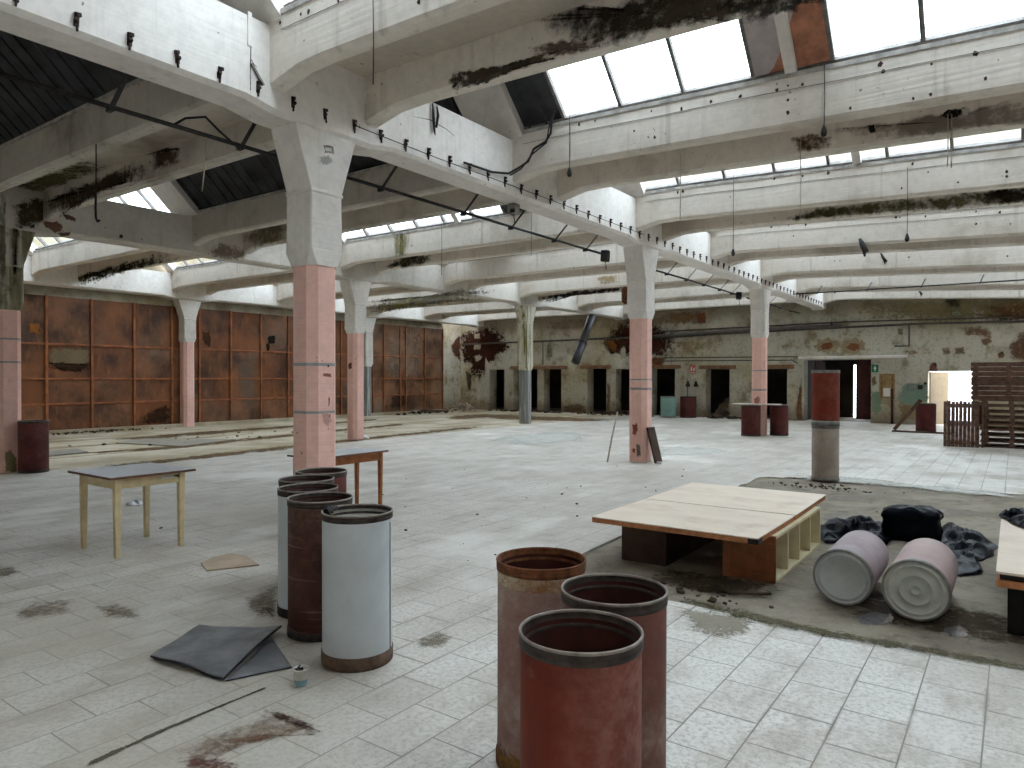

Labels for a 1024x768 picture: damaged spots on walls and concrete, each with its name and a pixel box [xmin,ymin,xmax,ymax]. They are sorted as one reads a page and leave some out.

mould [450,0,822,91]
damp [15,148,179,230]
mould [794,188,1024,221]
mould [211,225,286,260]
mould [78,255,165,285]
damp [370,288,480,313]